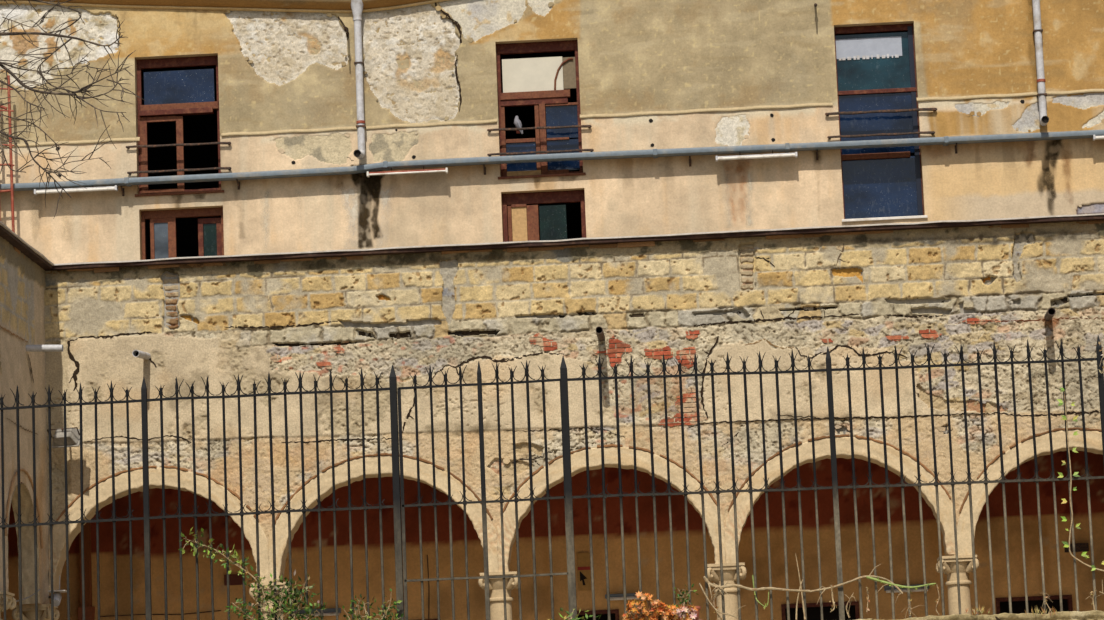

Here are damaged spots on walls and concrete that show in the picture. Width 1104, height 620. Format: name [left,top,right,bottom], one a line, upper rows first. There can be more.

peeling [0,3,119,90]
peeling [226,10,349,86]
peeling [361,0,560,162]
peeling [715,115,750,147]
peeling [1012,101,1043,132]
peeling [1052,92,1104,128]
leakage [1039,139,1062,210]
leakage [344,165,389,248]
crack [67,331,156,391]
flaking render [529,333,557,351]
flaking render [592,330,700,368]
flaking render [658,388,707,427]